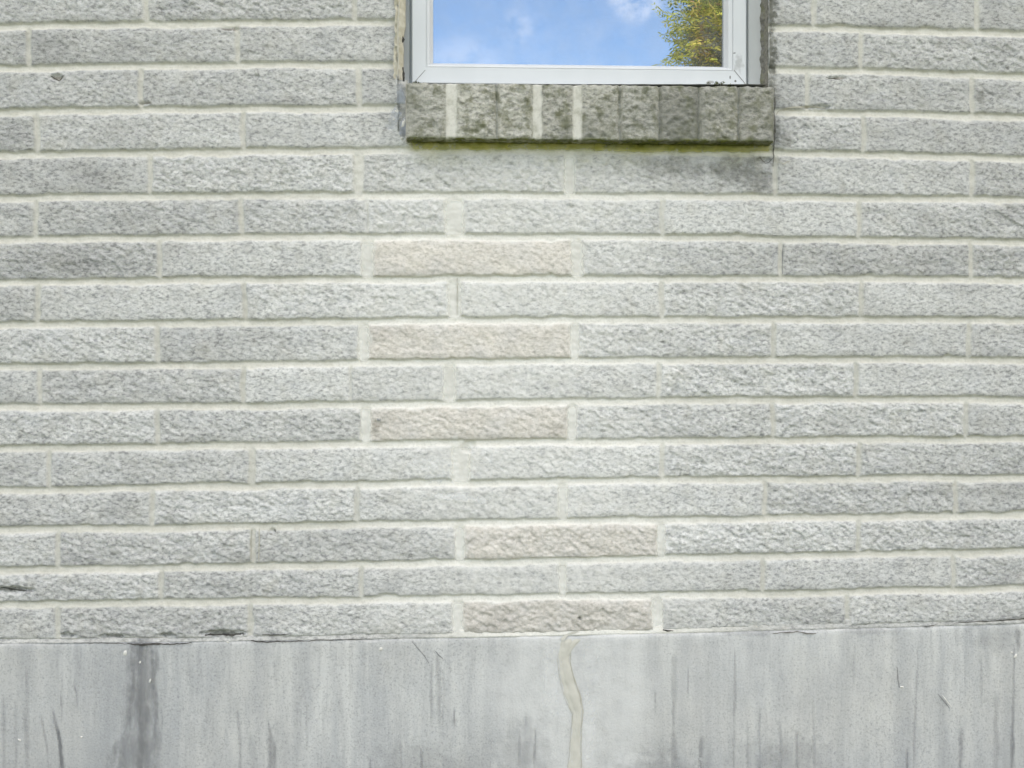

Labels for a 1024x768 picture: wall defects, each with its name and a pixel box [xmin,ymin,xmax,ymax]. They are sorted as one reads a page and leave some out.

damp [129,640,157,768]
crack [557,630,584,768]